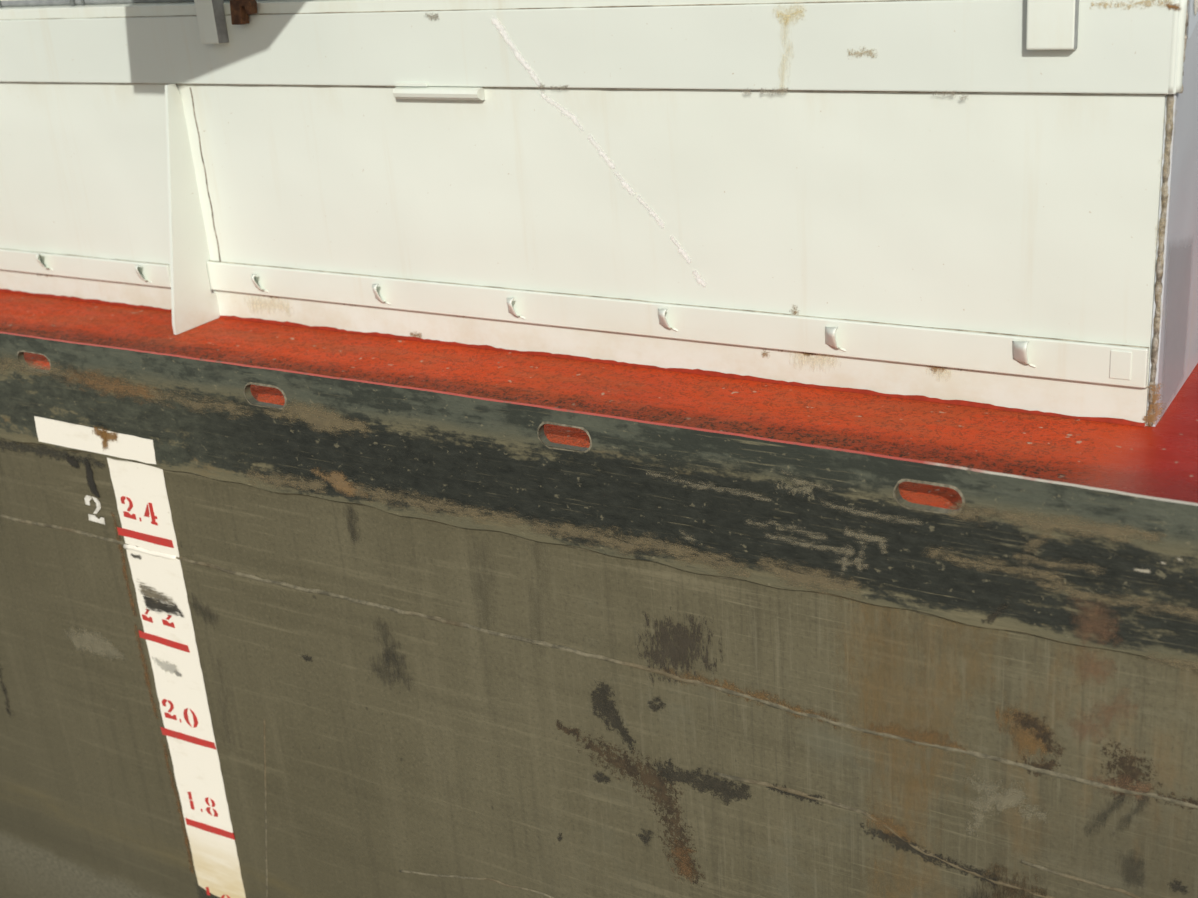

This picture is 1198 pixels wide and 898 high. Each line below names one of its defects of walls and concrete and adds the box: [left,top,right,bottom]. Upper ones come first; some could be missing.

peeling [0,358,250,416]
peeling [265,403,372,434]
rust [1142,384,1162,427]
peeling [247,471,861,594]
rust [556,681,752,887]
rust [768,785,822,804]
rust [996,709,1064,778]
rust [1101,743,1198,809]
rust [860,815,1047,898]